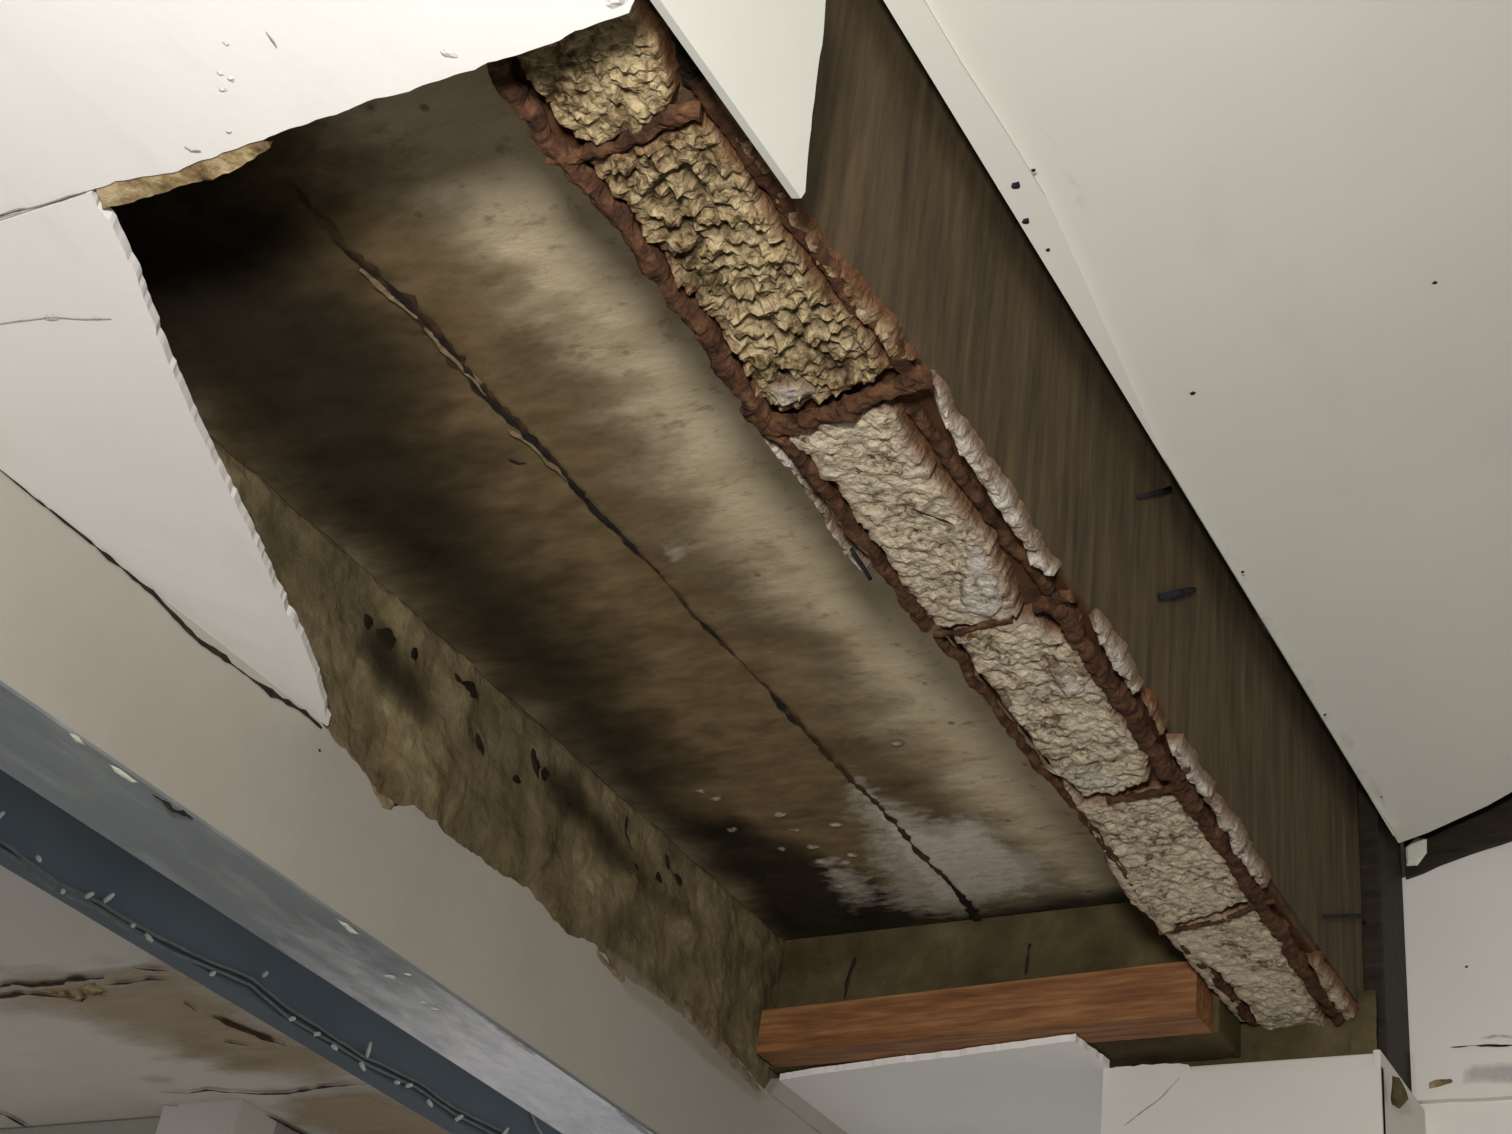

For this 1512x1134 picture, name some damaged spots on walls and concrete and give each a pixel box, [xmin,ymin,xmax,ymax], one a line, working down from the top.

crack [0,191,86,216]
spalling [96,129,274,209]
corrosion [512,56,641,230]
corrosion [766,358,922,414]
corrosion [908,385,1024,547]
crack [0,470,322,729]
spalling [363,614,418,661]
spalling [454,673,478,698]
water stain [109,118,1130,941]
crack [293,185,982,922]
water stain [31,972,333,1071]
water stain [295,1095,451,1134]